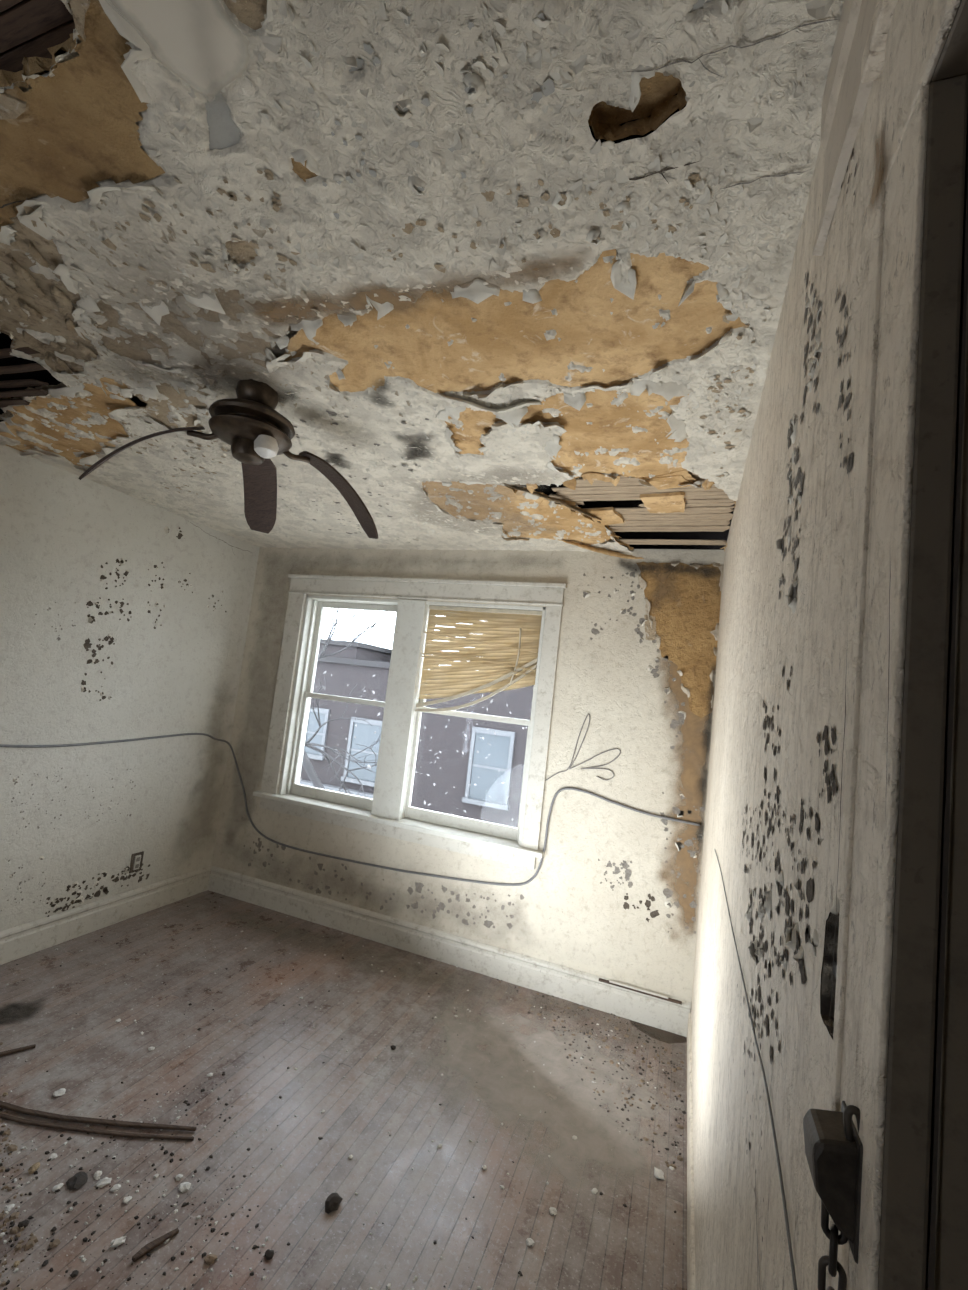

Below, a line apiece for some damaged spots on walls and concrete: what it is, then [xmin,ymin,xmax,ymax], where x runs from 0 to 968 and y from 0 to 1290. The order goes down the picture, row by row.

flaking render [0,0,774,749]
leakage [621,562,721,606]
leakage [661,660,714,932]
peeling [1,856,150,917]
mould [598,859,660,922]